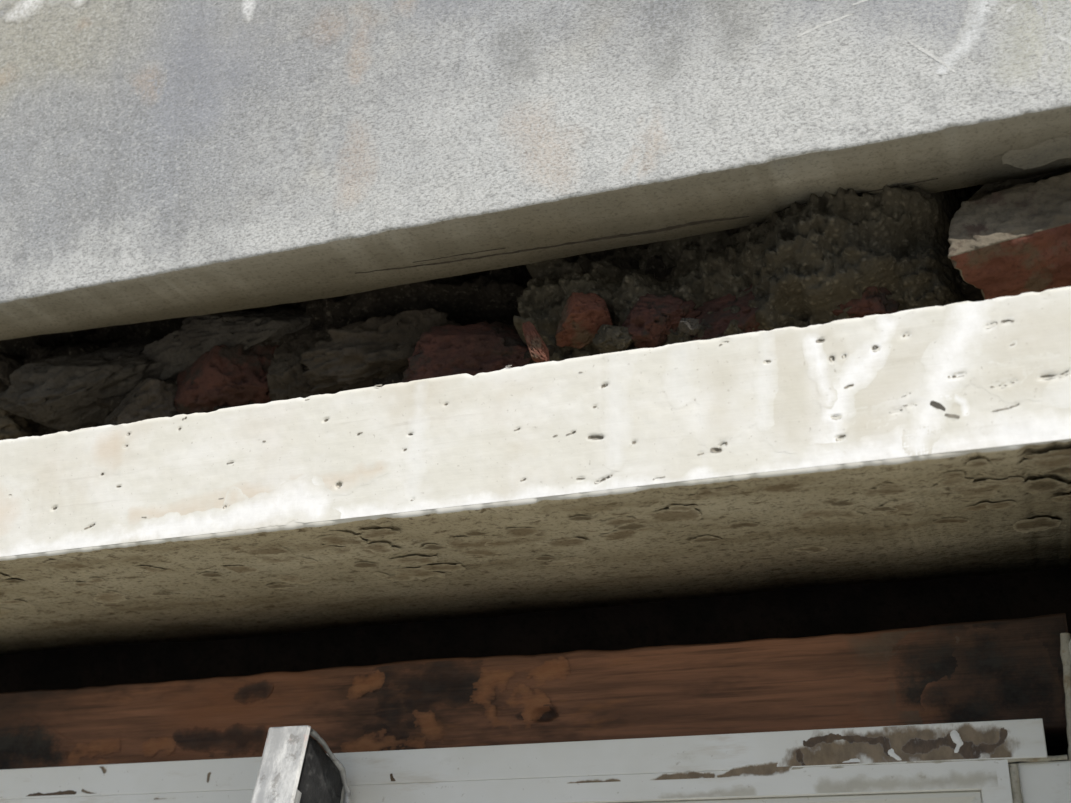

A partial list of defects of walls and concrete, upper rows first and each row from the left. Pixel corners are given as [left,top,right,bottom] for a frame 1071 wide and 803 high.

leakage [373,0,1071,96]
leakage [1002,136,1071,169]
peeling [777,723,1025,767]